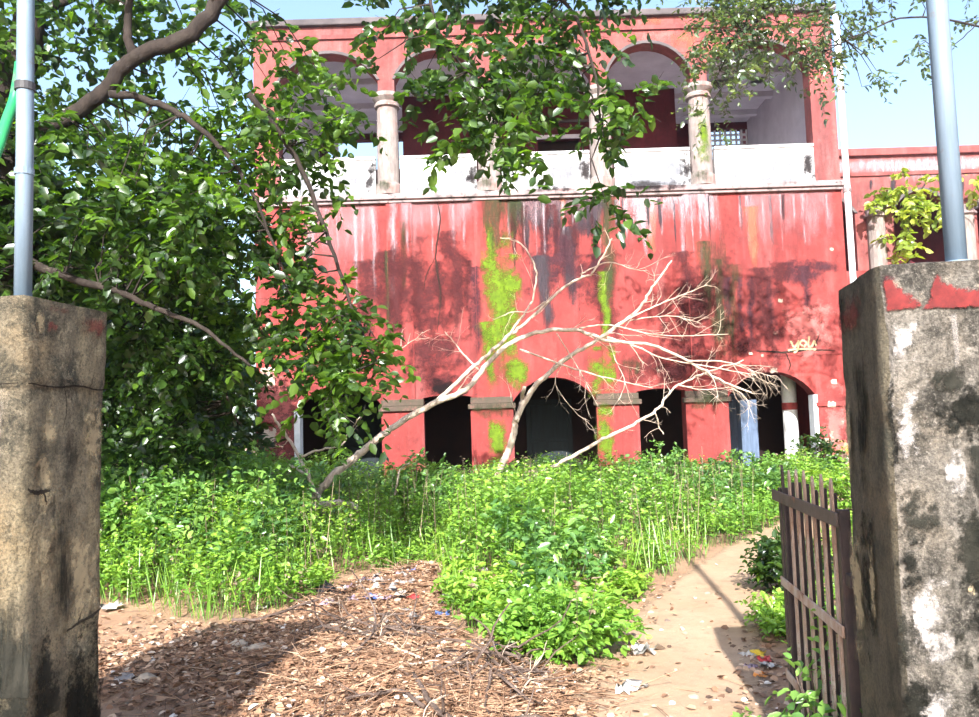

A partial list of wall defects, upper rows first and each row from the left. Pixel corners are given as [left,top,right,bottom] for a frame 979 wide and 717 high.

leakage [404,162,477,193]
leakage [354,231,482,387]
leakage [510,149,836,383]
peeling [883,275,979,311]
crack [0,376,106,432]
leakage [887,379,943,598]
leakage [929,366,979,494]
leakage [861,510,876,636]
leakage [951,507,979,672]
leakage [0,601,104,717]
leakage [903,681,929,717]
leakage [971,684,979,712]